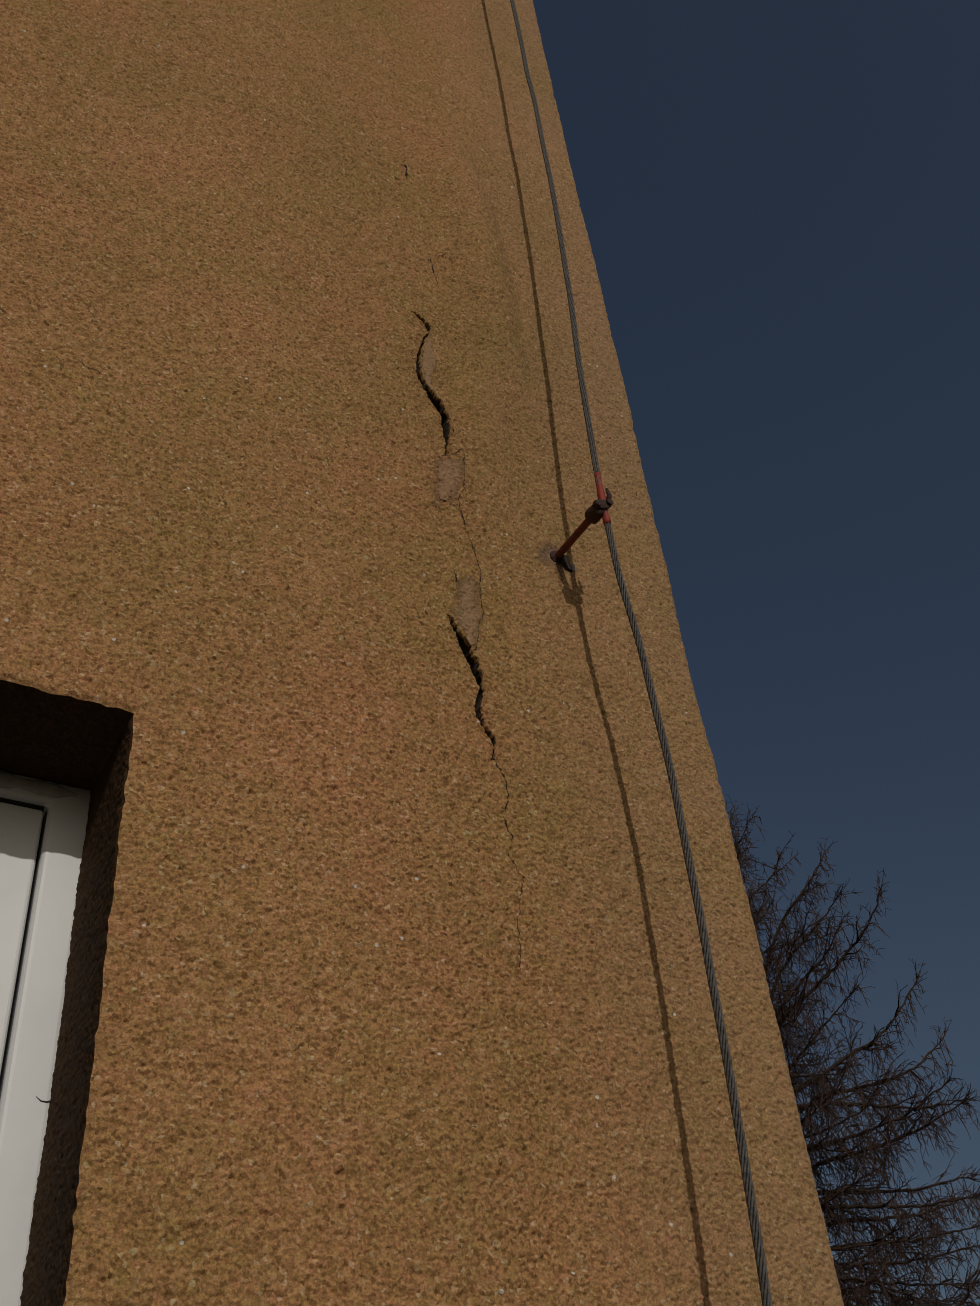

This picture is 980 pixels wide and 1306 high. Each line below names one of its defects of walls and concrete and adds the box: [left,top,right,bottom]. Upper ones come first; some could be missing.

crack [411,311,524,973]